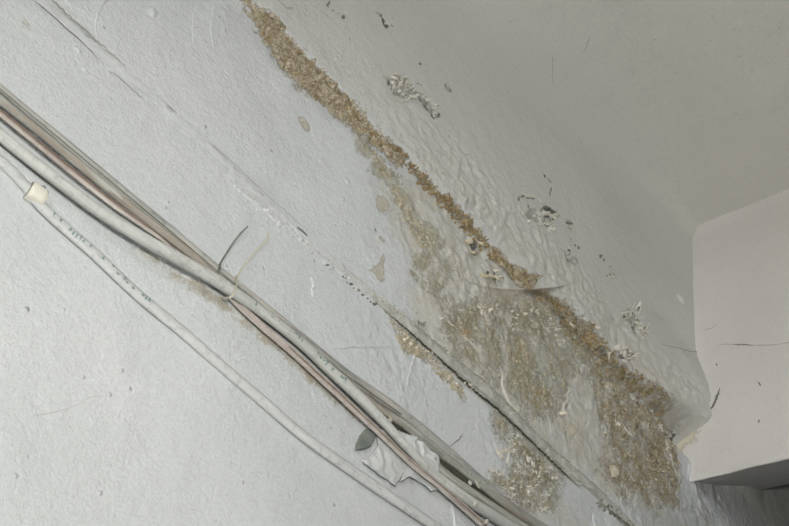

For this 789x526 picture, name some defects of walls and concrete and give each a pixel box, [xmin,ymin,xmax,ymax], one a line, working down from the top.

crack [34,0,96,57]
peeling [387,72,440,119]
peeling [518,175,573,232]
damp [389,320,466,400]
spalling [437,293,608,424]
spalling [488,410,563,513]
damp [587,358,695,514]